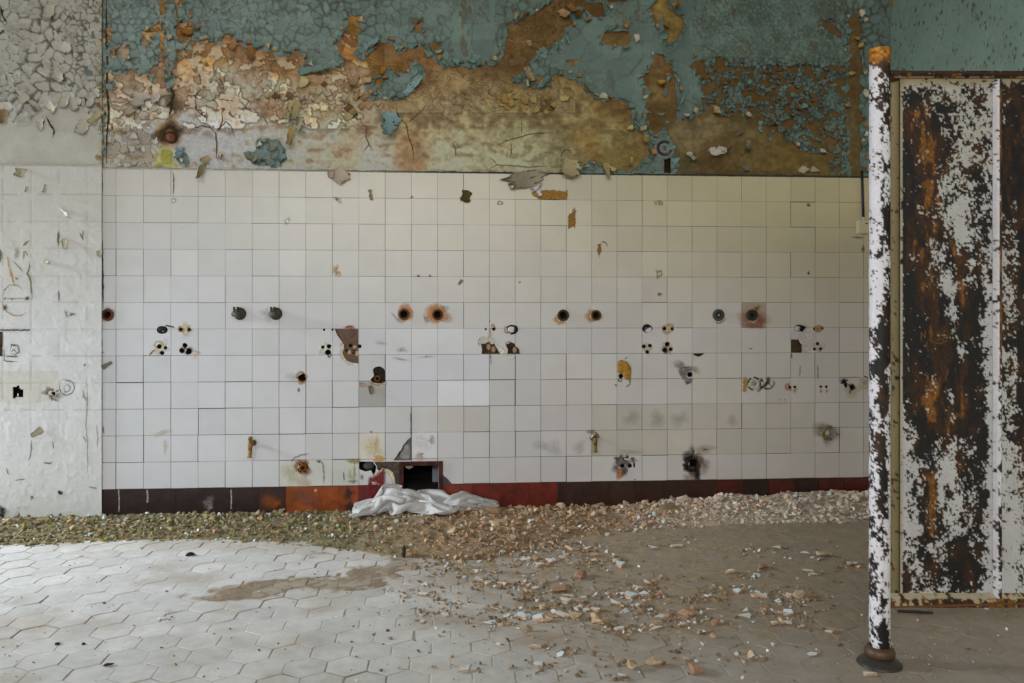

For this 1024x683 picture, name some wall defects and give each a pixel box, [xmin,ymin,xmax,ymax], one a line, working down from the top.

peeling [0,71,30,124]
peeling [35,0,869,190]
spalling [328,326,359,364]
spalling [359,413,412,485]